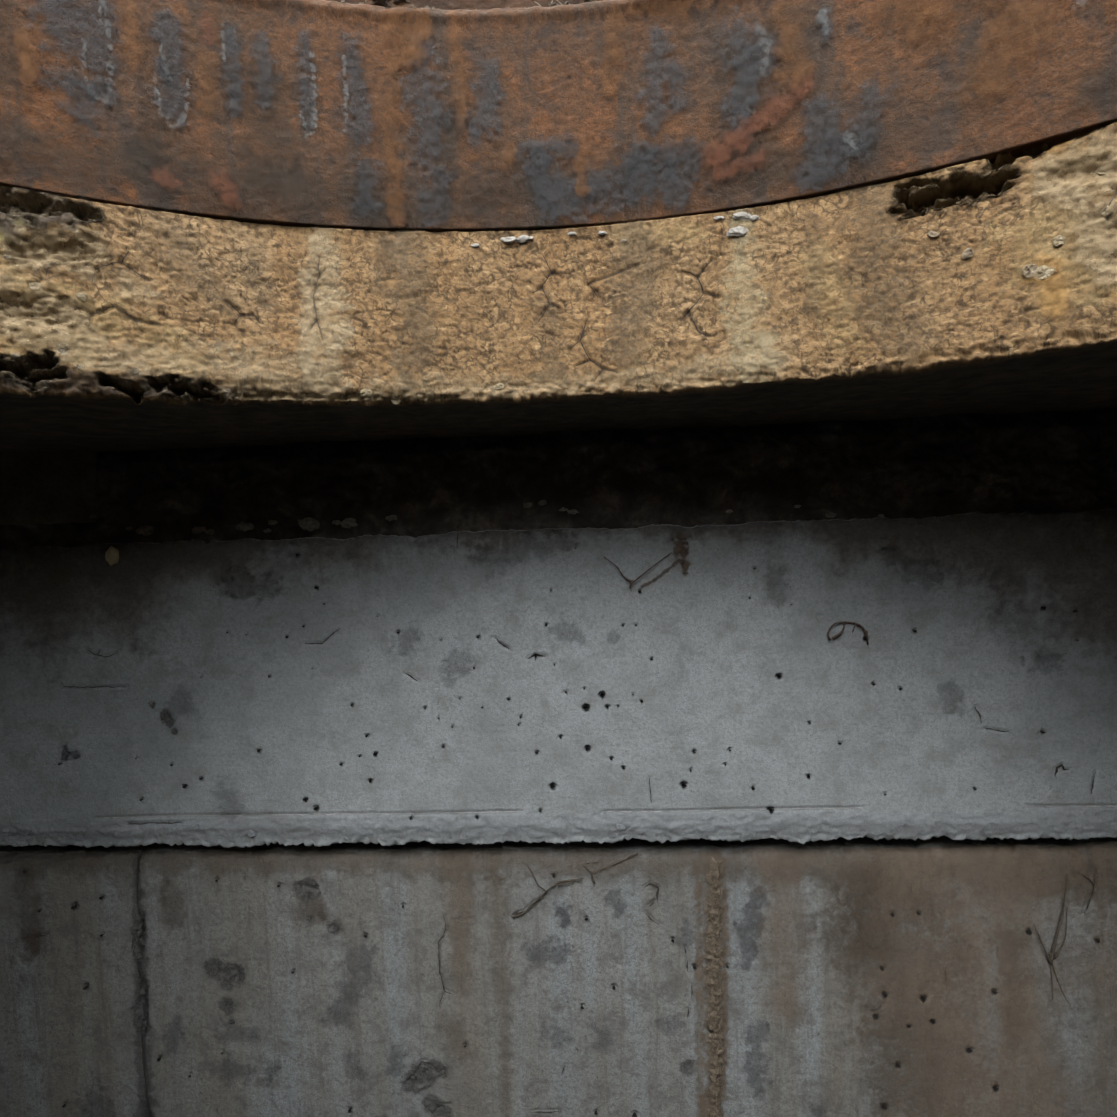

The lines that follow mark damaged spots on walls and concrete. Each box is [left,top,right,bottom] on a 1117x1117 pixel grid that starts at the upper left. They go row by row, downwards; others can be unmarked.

corrosion [707,80,812,179]
peeling [0,185,110,273]
peeling [887,126,1117,283]
peeling [0,282,461,405]
crack [533,255,561,322]
crack [571,265,637,382]
crack [681,260,718,336]
crack [127,822,181,1117]